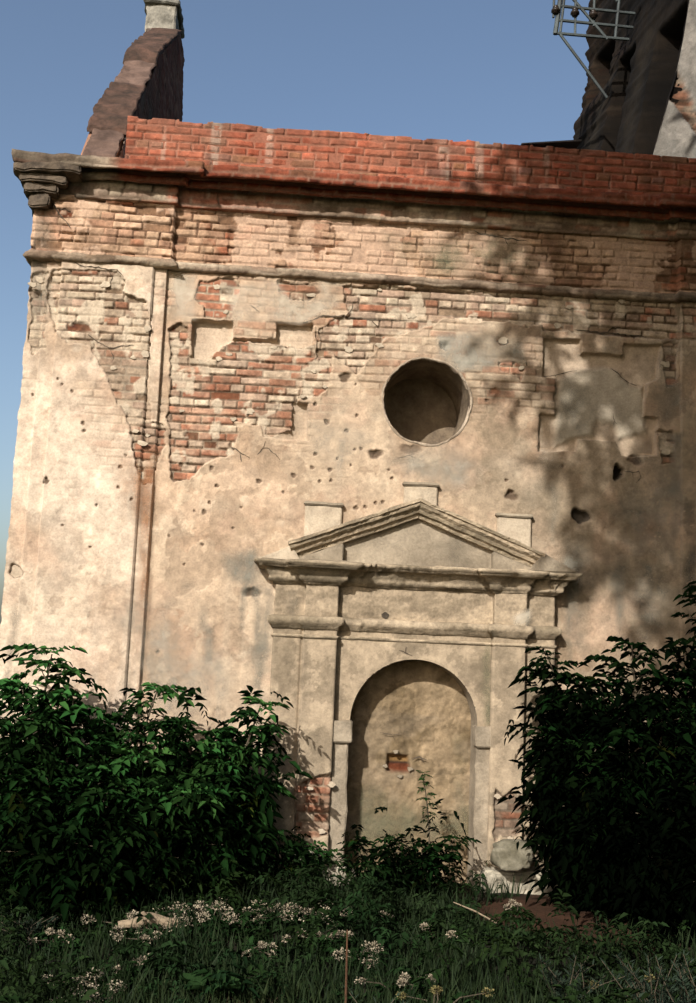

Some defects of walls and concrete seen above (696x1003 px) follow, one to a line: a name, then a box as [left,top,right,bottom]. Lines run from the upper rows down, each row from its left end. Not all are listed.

flaking render [28,268,696,485]
spalling [572,508,590,524]
flaking render [383,750,413,778]
flaking render [294,774,336,839]